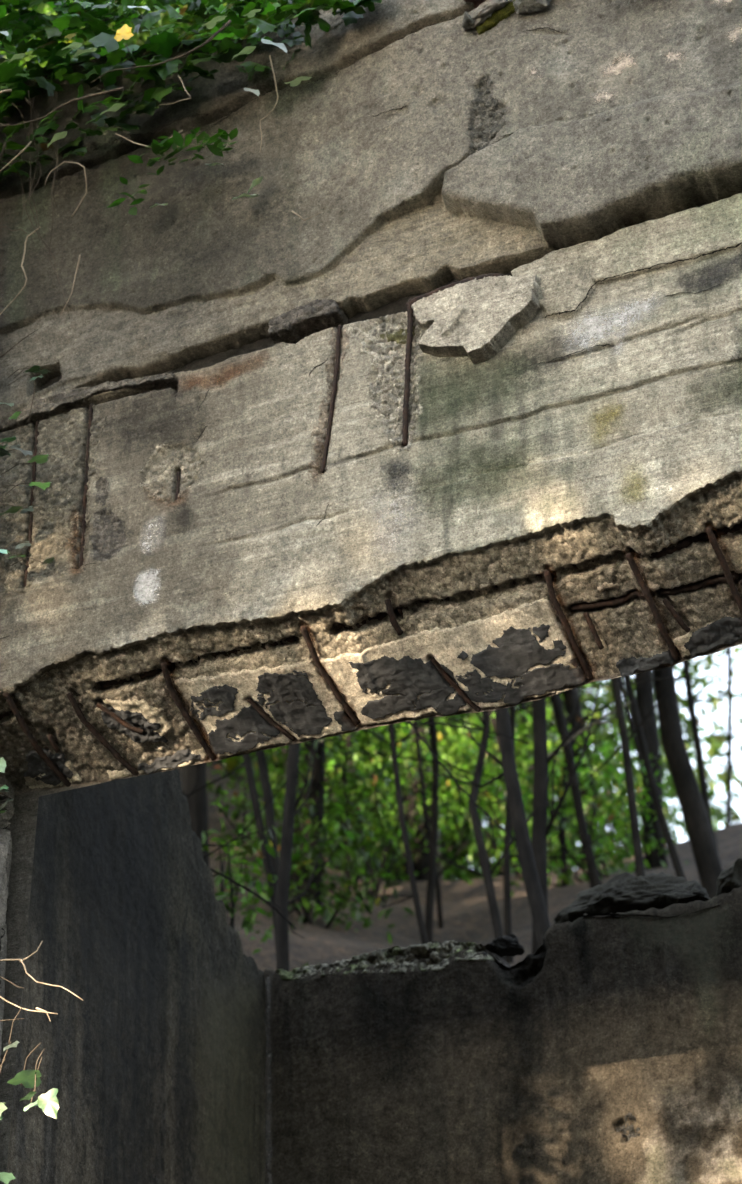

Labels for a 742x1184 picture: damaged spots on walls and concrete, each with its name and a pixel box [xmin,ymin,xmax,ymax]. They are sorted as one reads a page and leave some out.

crack [465,76,514,155]
crack [342,272,512,328]
crack [545,243,742,318]
crack [41,375,62,390]
crack [158,337,297,442]
crack [538,344,615,364]
spalling [0,403,127,594]
spalling [140,444,205,505]
peeling [174,598,594,757]
peeling [612,616,742,679]
peeling [101,706,168,744]
spalling [275,940,501,981]